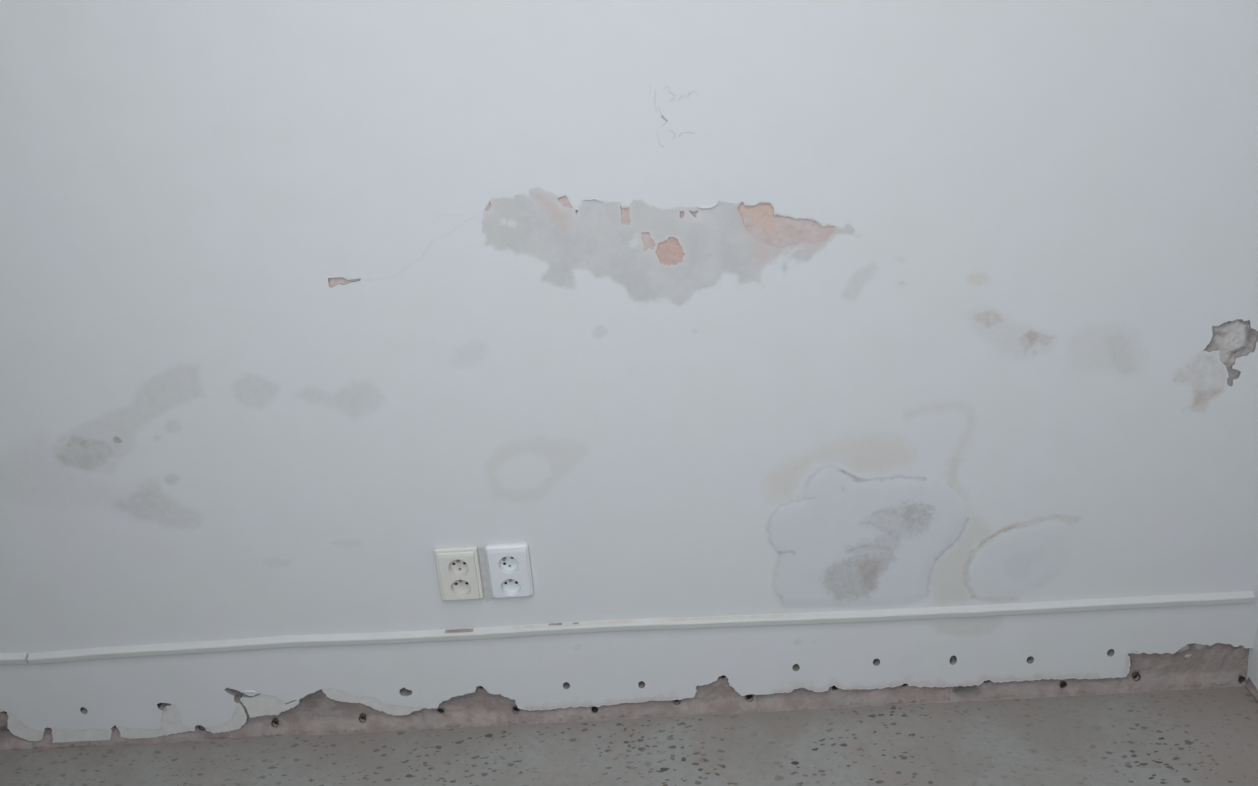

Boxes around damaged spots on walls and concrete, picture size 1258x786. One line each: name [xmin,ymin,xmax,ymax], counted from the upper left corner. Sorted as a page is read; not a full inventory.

spalling [329,277,361,287]
peeling [478,187,871,311]
spalling [1165,319,1258,417]
leakage [0,356,399,537]
spalling [0,643,1258,752]